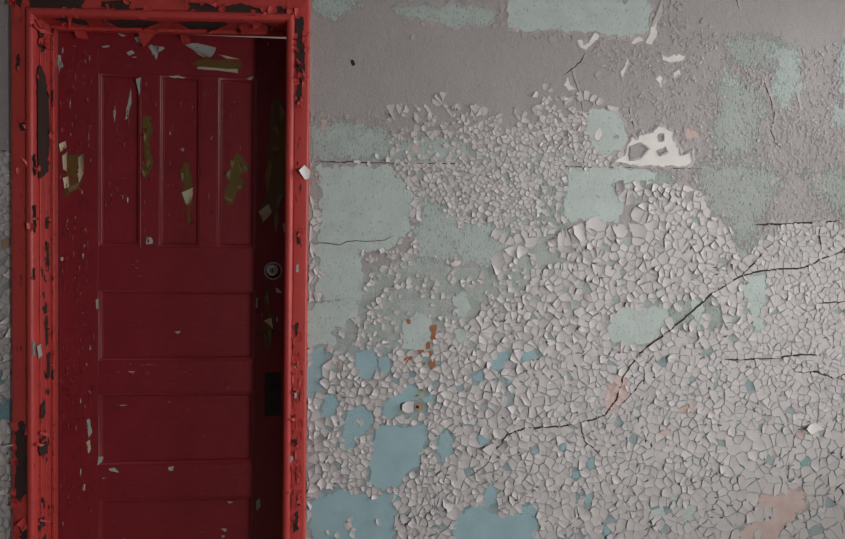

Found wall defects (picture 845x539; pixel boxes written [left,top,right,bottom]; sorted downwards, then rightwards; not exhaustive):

peeling [101,0,134,10]
peeling [7,0,89,70]
peeling [103,18,165,59]
peeling [113,77,141,123]
peeling [0,65,85,539]
crack [471,220,845,476]
peeling [86,419,103,466]